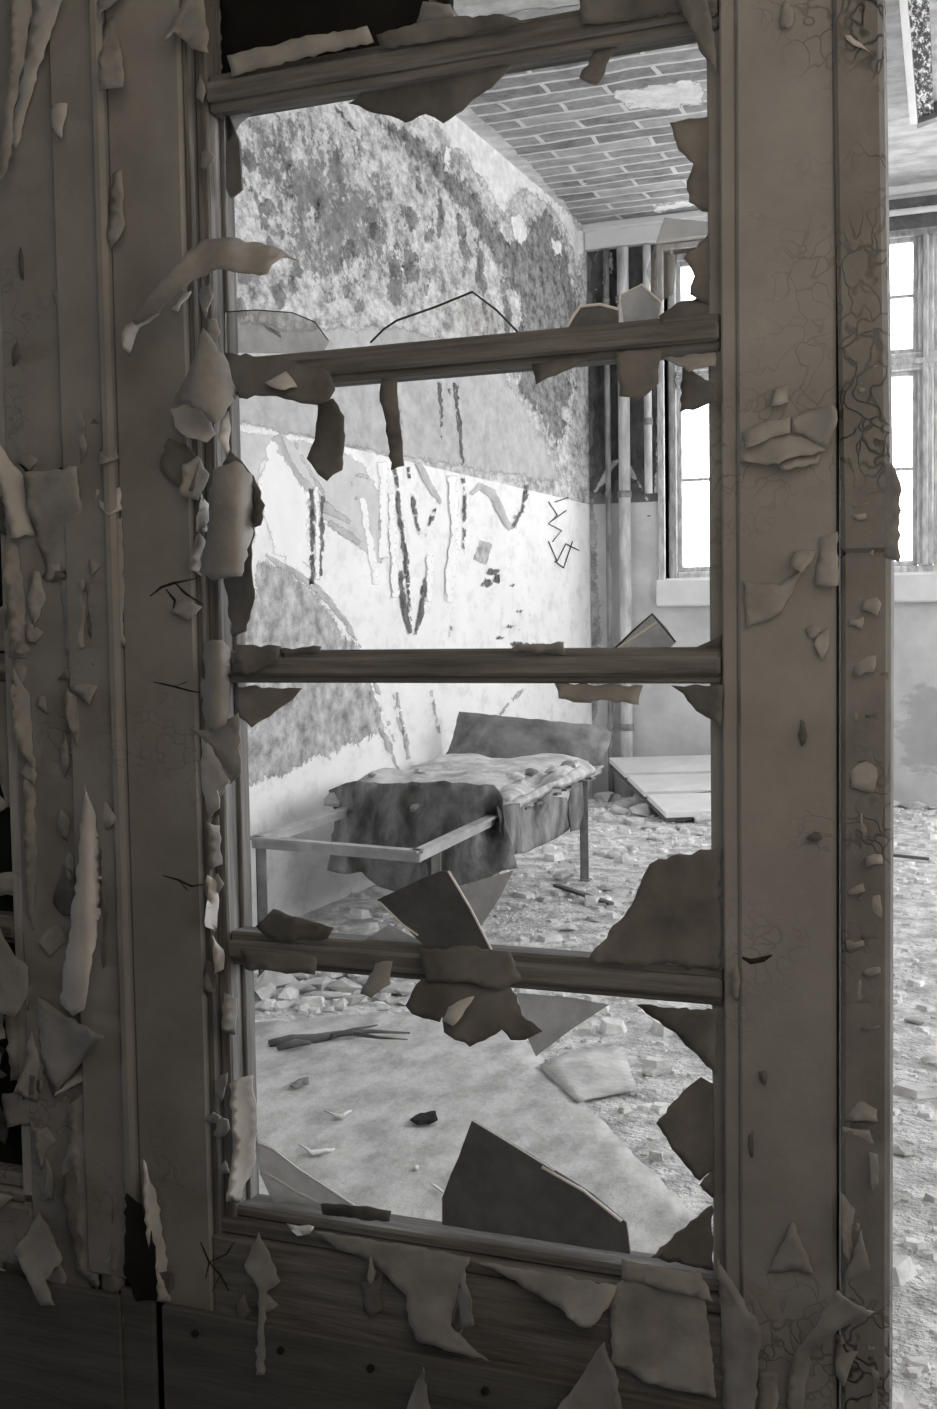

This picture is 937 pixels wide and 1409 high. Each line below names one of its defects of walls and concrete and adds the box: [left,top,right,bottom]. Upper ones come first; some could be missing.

peeling [845,35,872,54]
peeling [738,384,838,470]
peeling [853,463,902,562]
flaking render [121,229,566,1047]
peeling [697,634,723,655]
peeling [671,684,724,728]
peeling [850,760,878,794]
peeling [0,409,126,1306]
peeling [143,1159,174,1304]
peeling [286,1004,879,1409]
peeling [237,1232,281,1375]